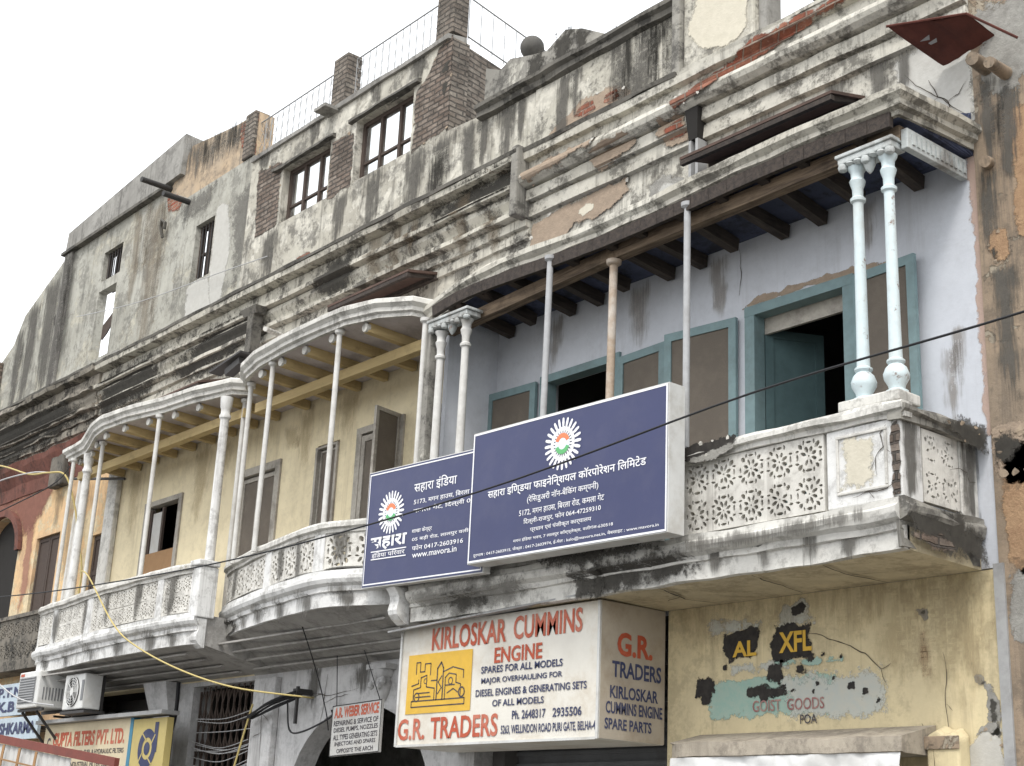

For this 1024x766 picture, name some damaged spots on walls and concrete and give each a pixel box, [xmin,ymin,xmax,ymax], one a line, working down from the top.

damp [526,26,590,77]
flaking render [655,0,844,146]
crack [909,79,965,113]
damp [404,98,527,233]
flaking render [519,131,636,186]
damp [9,253,73,405]
damp [98,312,247,415]
flaking render [742,262,886,310]
flaking render [943,103,1024,645]
damp [536,509,862,600]
crack [807,633,891,681]
flaking render [970,674,1004,766]